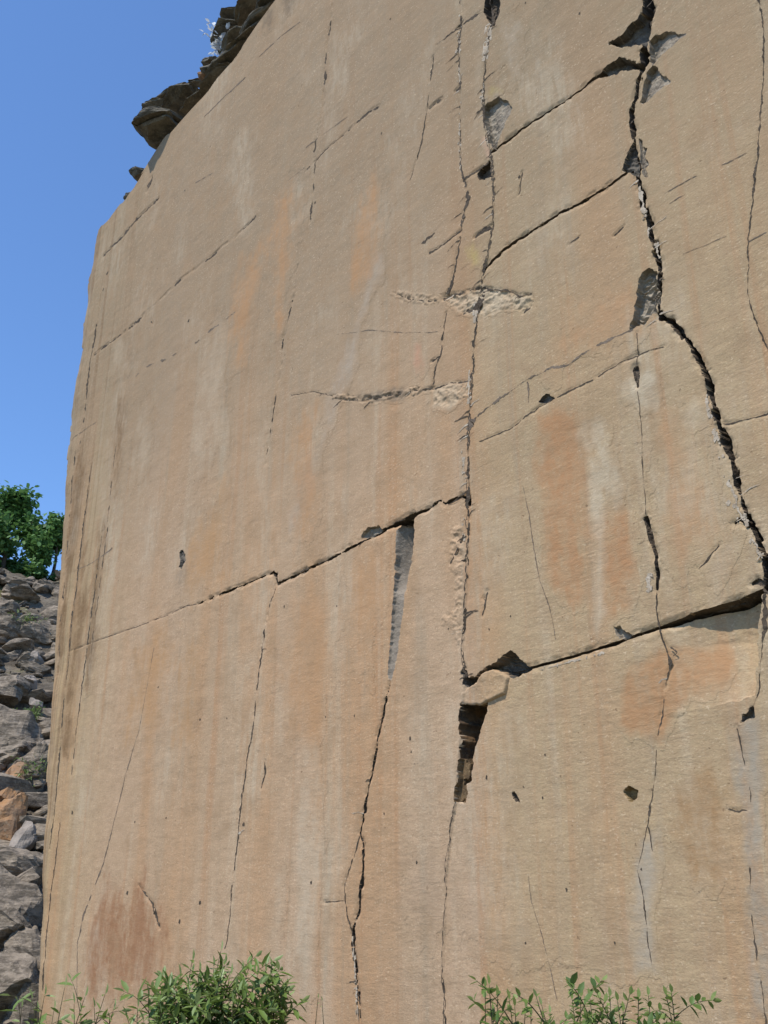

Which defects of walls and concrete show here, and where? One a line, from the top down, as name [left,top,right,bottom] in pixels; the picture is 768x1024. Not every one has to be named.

spalling [602,14,686,104]
spalling [482,96,512,150]
spalling [389,288,440,307]
spalling [630,268,662,330]
crack [58,0,768,736]
spalling [460,650,534,687]
crack [224,629,266,949]
crack [326,685,390,1018]
spalling [454,702,488,804]
crack [637,700,665,959]
crack [729,728,751,813]
crack [441,804,455,1024]